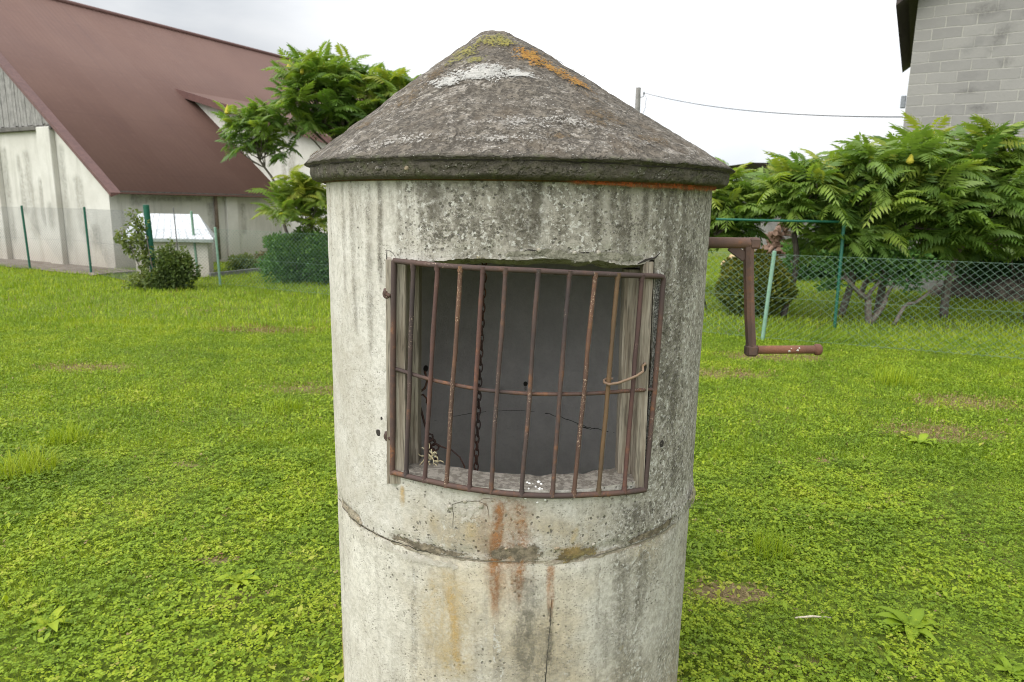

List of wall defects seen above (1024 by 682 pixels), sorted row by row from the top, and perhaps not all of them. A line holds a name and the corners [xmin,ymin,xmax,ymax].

rust [573,180,716,191]
rust [491,506,502,604]
crack [544,600,552,682]